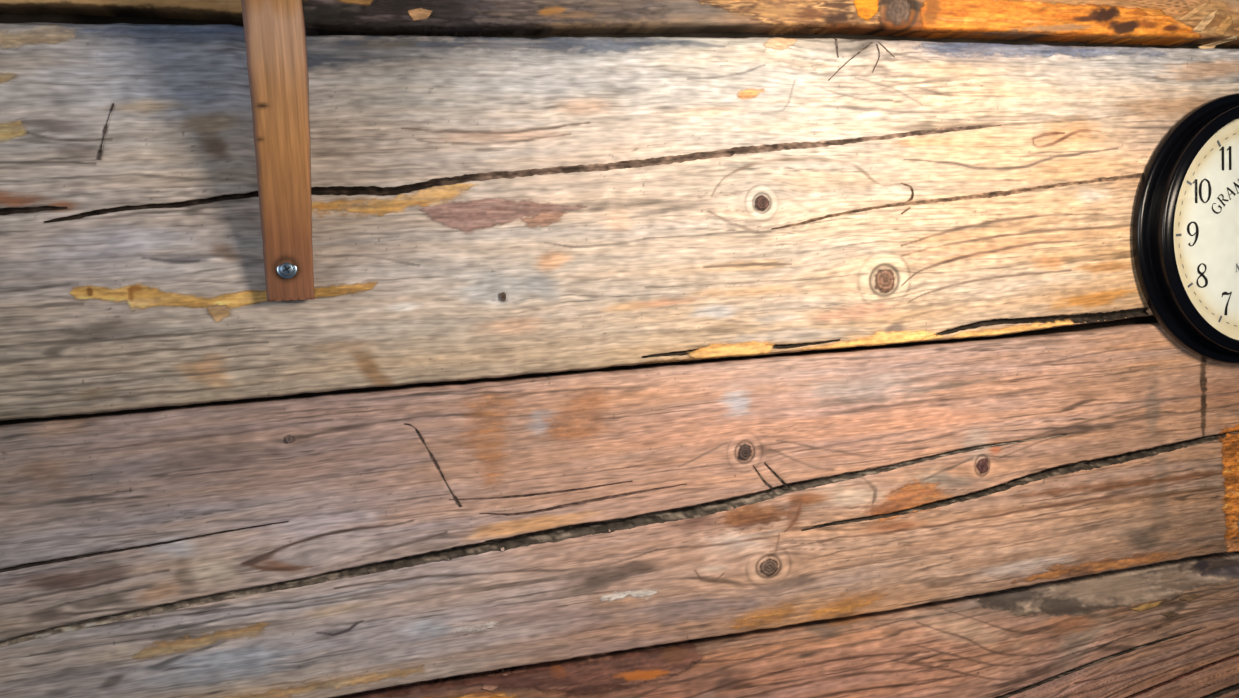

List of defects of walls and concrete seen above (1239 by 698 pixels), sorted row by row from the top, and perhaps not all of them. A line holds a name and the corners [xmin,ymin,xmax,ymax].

peeling [920,0,1239,49]
crack [311,125,1001,196]
crack [0,191,259,223]
peeling [69,284,267,322]
peeling [314,282,377,298]
crack [0,423,1239,647]
peeling [425,668,518,698]
crack [996,627,1205,698]
crack [1125,654,1239,698]